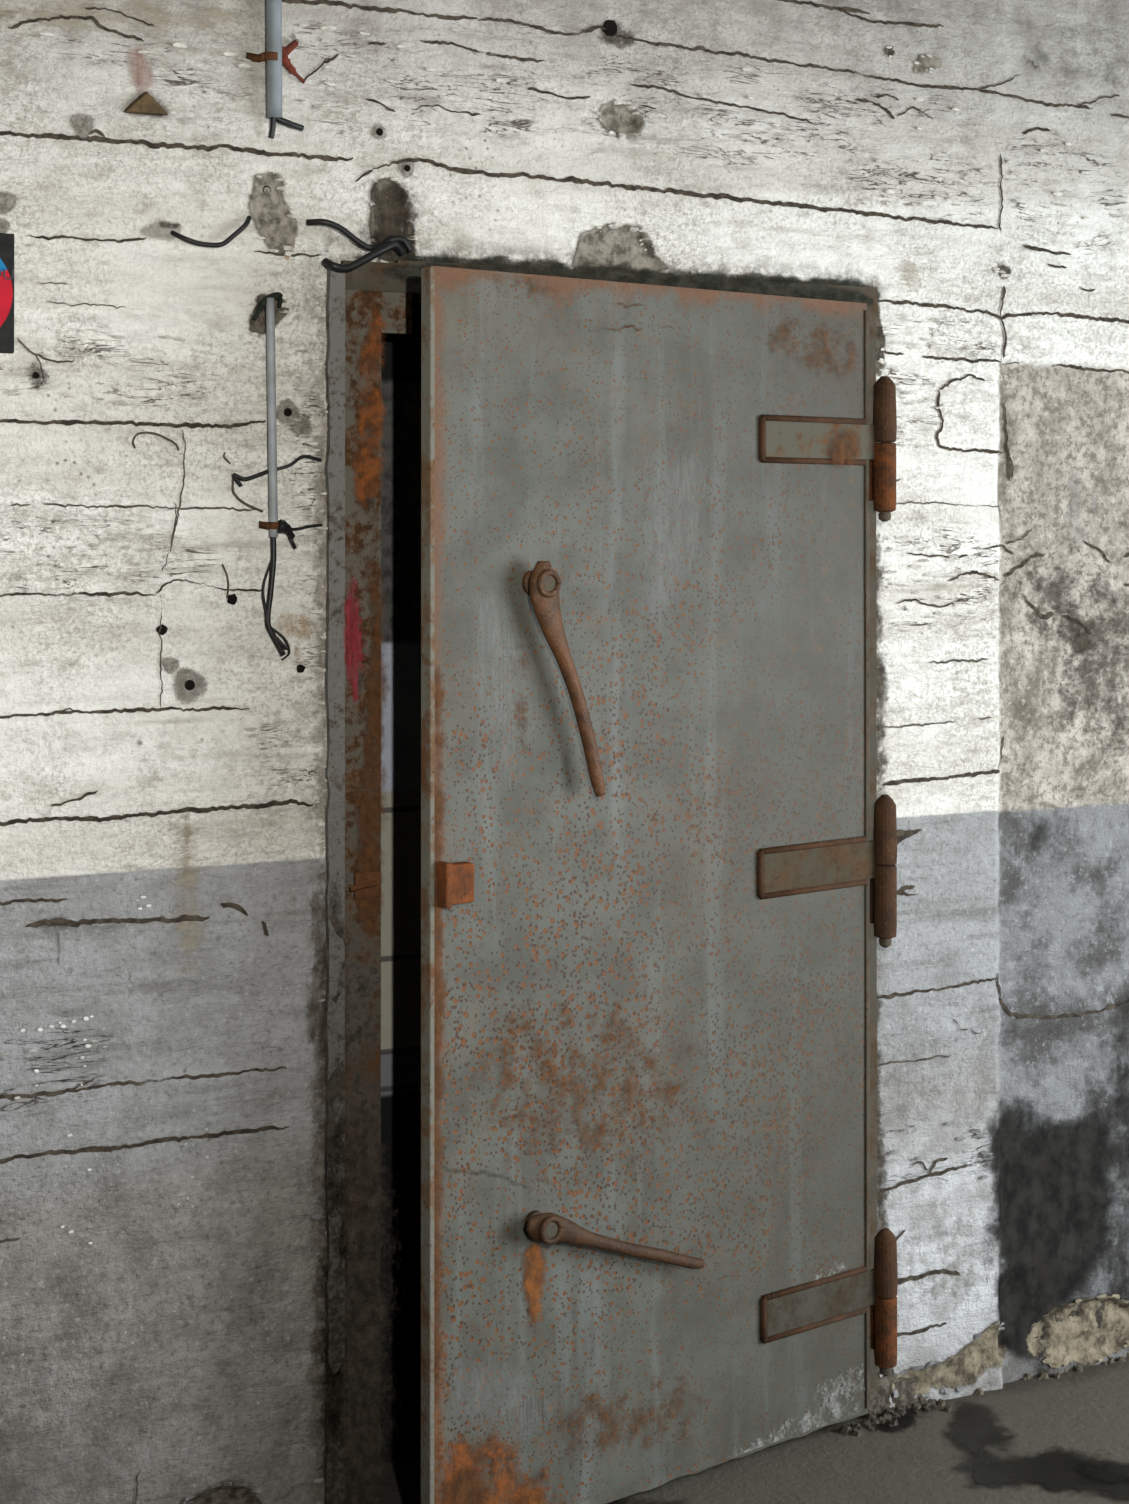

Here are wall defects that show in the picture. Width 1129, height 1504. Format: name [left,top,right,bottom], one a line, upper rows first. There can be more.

spalling [249,172,298,256]
spalling [569,222,669,274]
crack [0,0,1129,634]
crack [0,337,266,719]
rust [355,560,389,872]
crack [0,790,313,826]
leakage [1030,825,1047,849]
rust [434,786,447,1379]
leakage [988,996,1129,1359]
rust [523,1244,545,1322]
spalling [868,1321,1007,1415]
spalling [1027,1294,1129,1368]